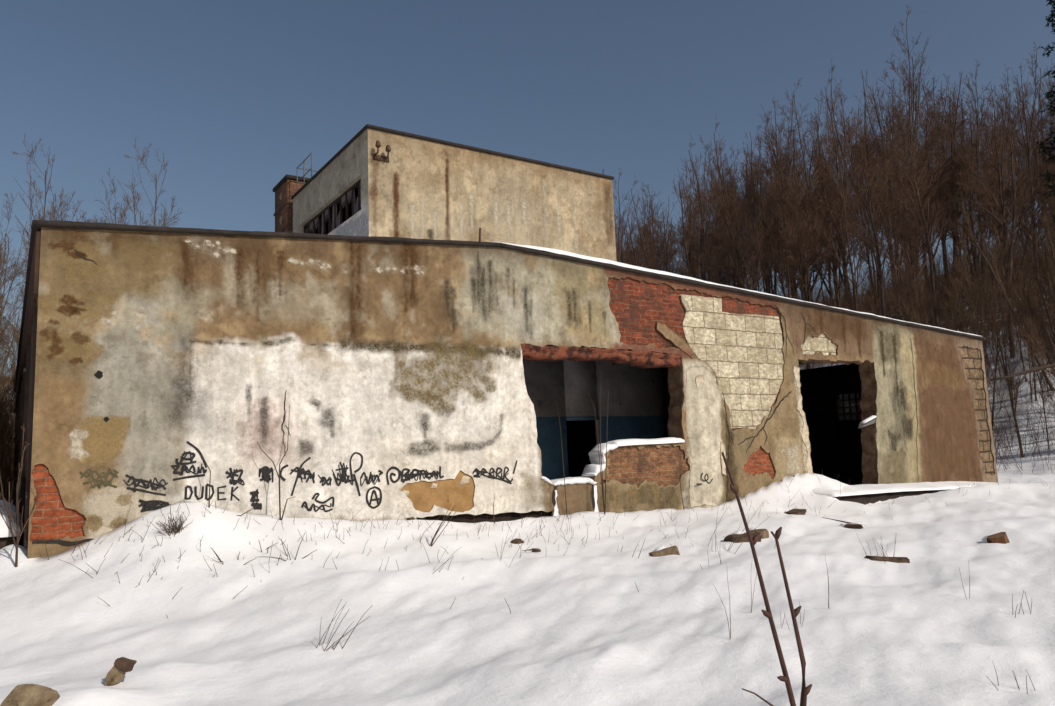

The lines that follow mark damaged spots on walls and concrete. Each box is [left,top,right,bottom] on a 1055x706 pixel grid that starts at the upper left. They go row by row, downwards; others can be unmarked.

flaking render [607,277,783,349]
spalling [30,464,135,544]
flaking render [401,470,475,512]
crack [722,391,792,500]
spalling [744,447,775,479]
spalling [793,334,837,473]
water stain [880,332,906,408]
water stain [888,420,913,451]